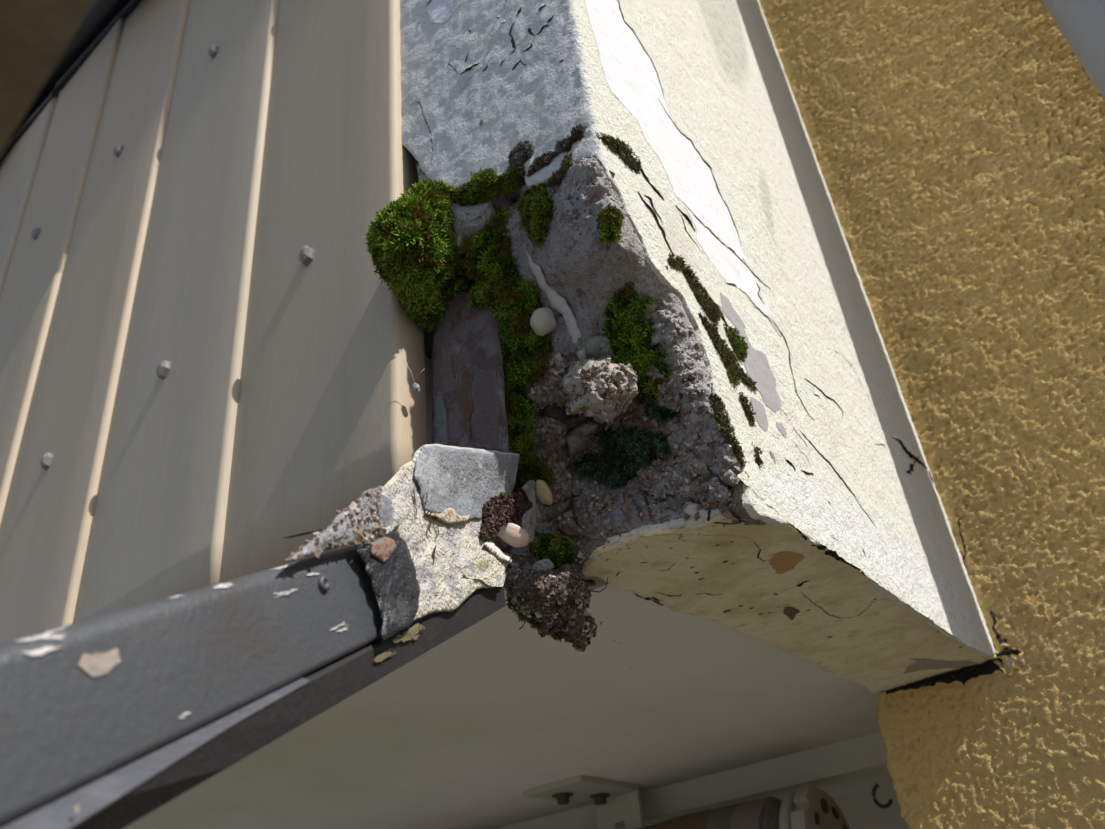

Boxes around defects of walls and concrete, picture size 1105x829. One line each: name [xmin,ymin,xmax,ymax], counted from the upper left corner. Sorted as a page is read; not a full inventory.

crack [448,1,554,74]
efflorescence [524,249,586,361]
peeling [585,0,776,326]
crack [619,1,875,525]
leakage [754,160,783,262]
spalling [490,156,765,587]
peeling [711,292,787,438]
leakage [639,534,752,552]
crack [707,454,767,561]
peeling [78,648,121,677]
peeling [374,623,425,662]
crack [990,610,1007,646]